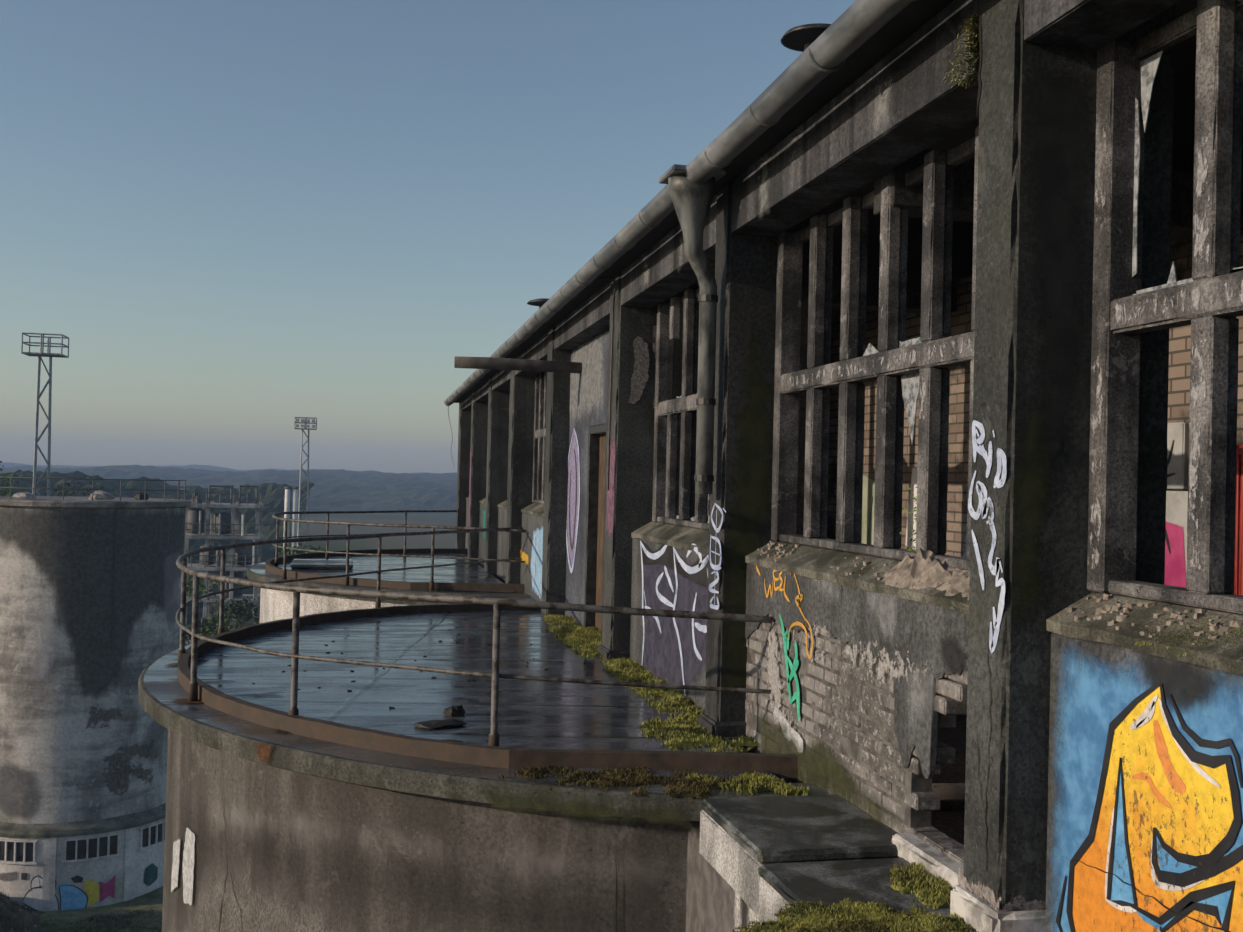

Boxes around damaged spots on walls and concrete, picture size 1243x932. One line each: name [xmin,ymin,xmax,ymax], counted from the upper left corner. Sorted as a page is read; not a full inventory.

leakage [0,507,186,698]
peeling [764,623,803,753]
peeling [839,634,933,696]
leakage [0,768,37,818]